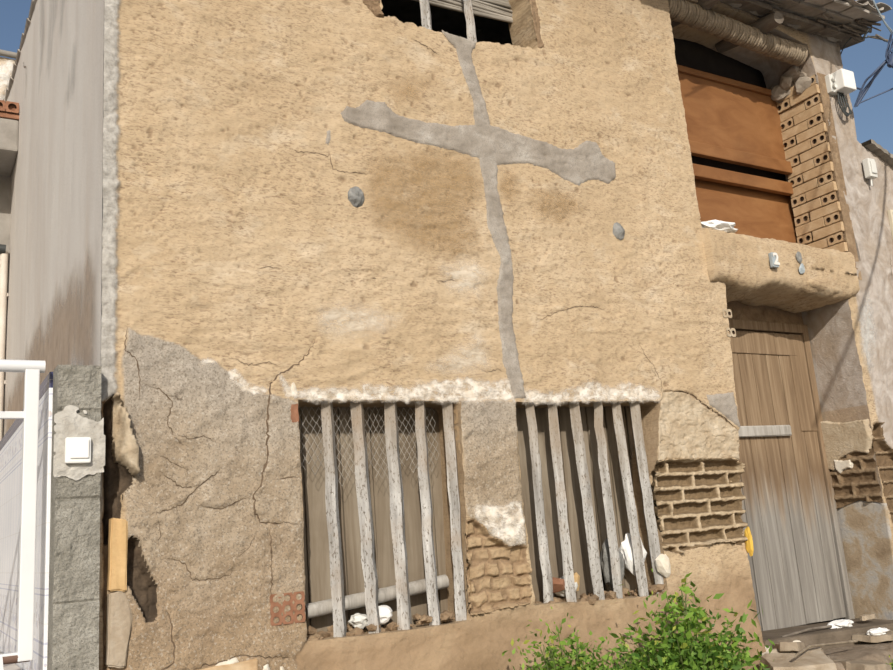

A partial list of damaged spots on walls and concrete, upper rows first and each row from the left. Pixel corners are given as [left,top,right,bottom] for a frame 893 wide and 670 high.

water stain [6,372,25,432]
water stain [28,261,92,386]
spalling [101,392,140,670]
spalling [127,536,159,623]
crack [124,328,224,543]
crack [161,604,291,670]
crack [174,338,316,593]
peeling [227,369,266,395]
spalling [465,502,532,615]
spalling [280,376,748,554]
peeling [820,419,893,620]